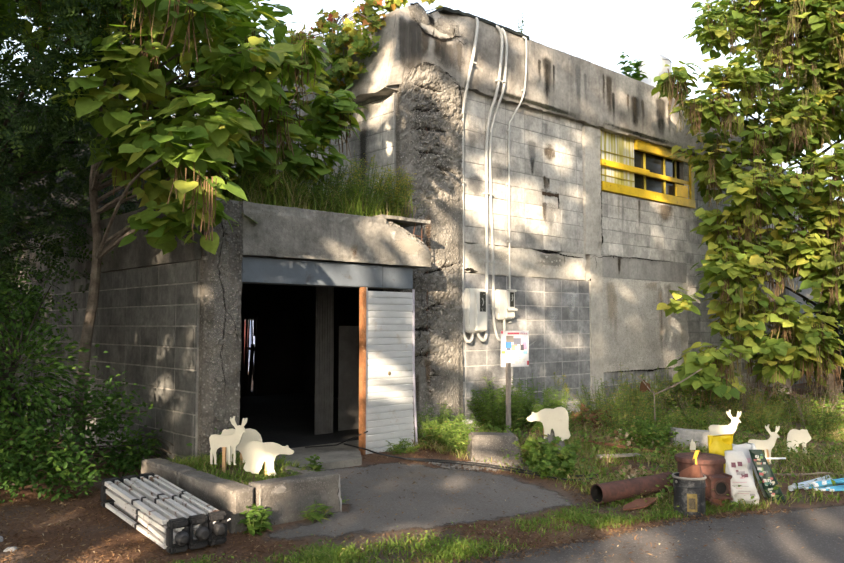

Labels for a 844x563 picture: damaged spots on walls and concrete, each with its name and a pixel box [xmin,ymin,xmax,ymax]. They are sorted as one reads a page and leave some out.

spalling [408,2,462,41]
spalling [410,86,449,158]
water stain [538,58,555,93]
water stain [603,75,615,113]
water stain [627,95,644,124]
spalling [389,222,425,254]
crack [217,221,238,395]
spalling [413,271,447,396]